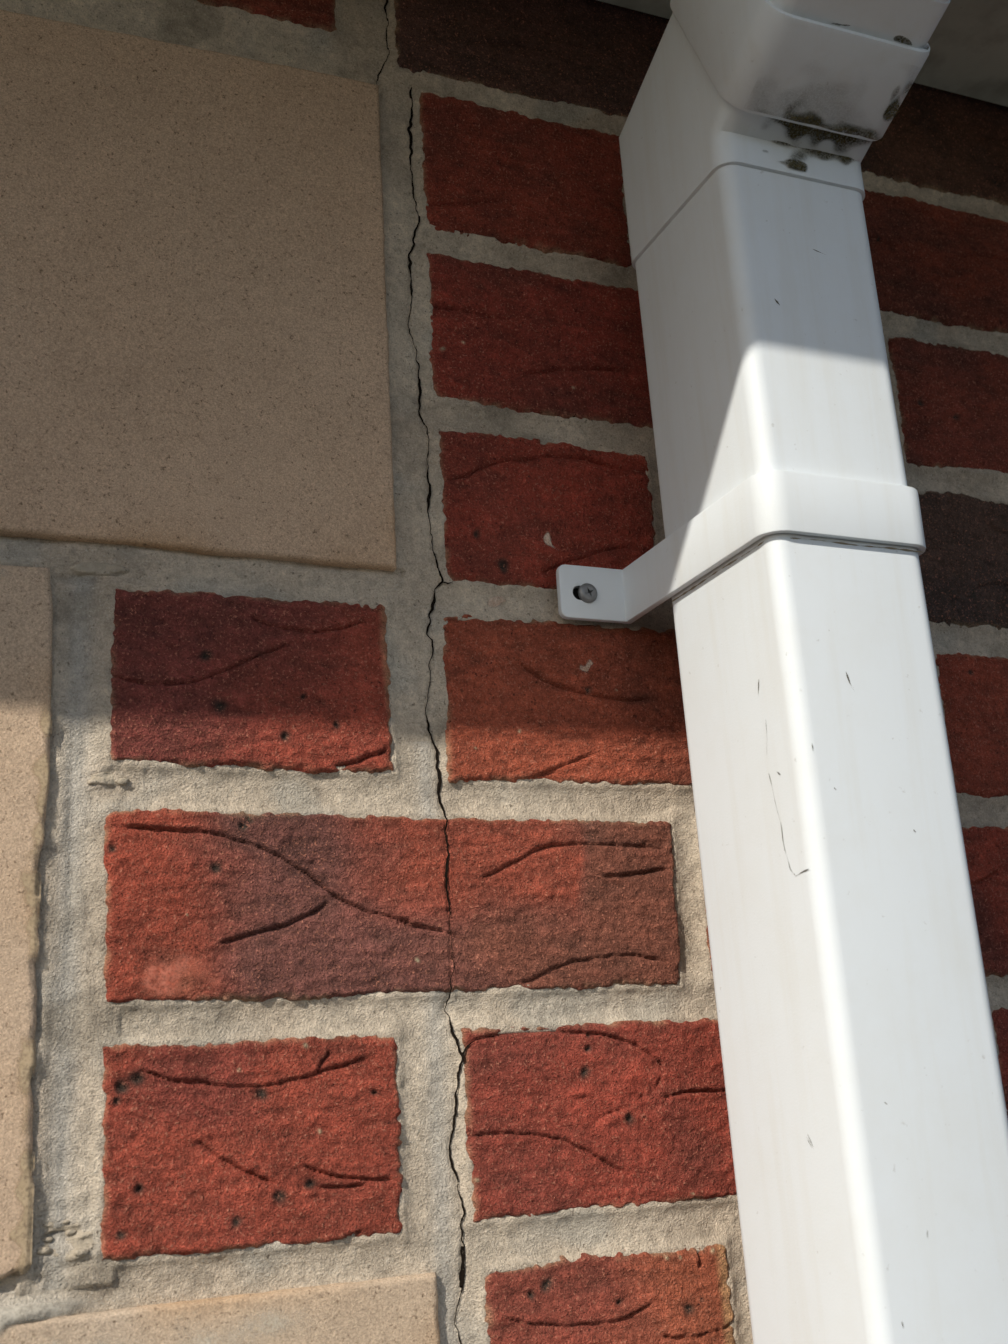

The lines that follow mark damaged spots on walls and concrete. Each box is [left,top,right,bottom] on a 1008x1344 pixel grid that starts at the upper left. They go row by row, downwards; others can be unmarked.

crack [376,0,390,83]
crack [407,86,474,1344]